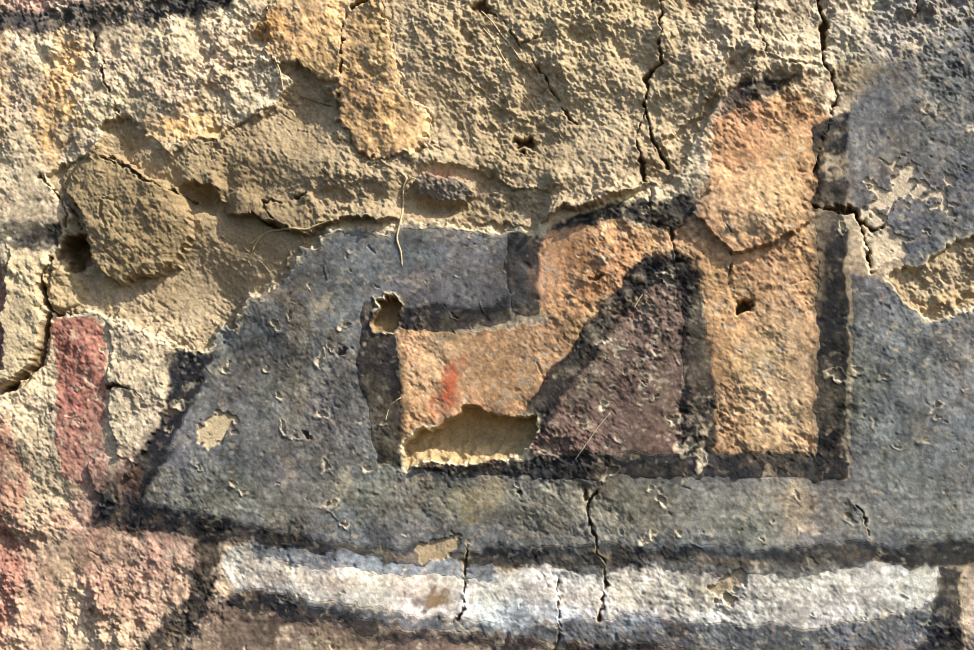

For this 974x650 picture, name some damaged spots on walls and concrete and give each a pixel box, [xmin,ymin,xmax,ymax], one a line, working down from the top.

flaking render [0,0,835,384]
crack [485,11,578,126]
crack [635,0,678,263]
crack [754,0,768,52]
crack [812,0,839,174]
flaking render [859,155,974,324]
crack [2,259,81,394]
flaking render [197,410,239,450]
flaking render [397,406,539,475]
flaking render [415,531,462,565]
crack [583,482,610,622]
flaking render [707,568,747,607]